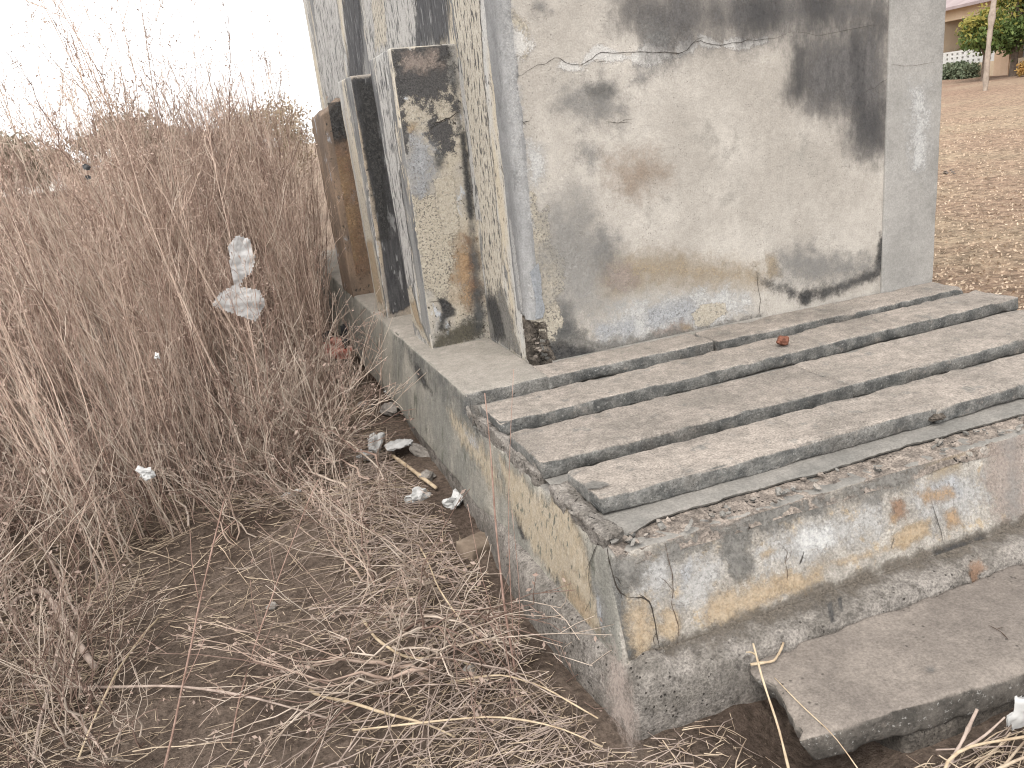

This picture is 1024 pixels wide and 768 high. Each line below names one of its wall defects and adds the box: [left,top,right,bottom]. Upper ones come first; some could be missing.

damp [391,0,473,219]
crack [519,25,876,76]
damp [622,0,888,155]
peeling [522,141,566,362]
damp [766,238,882,305]
crack [585,543,692,648]